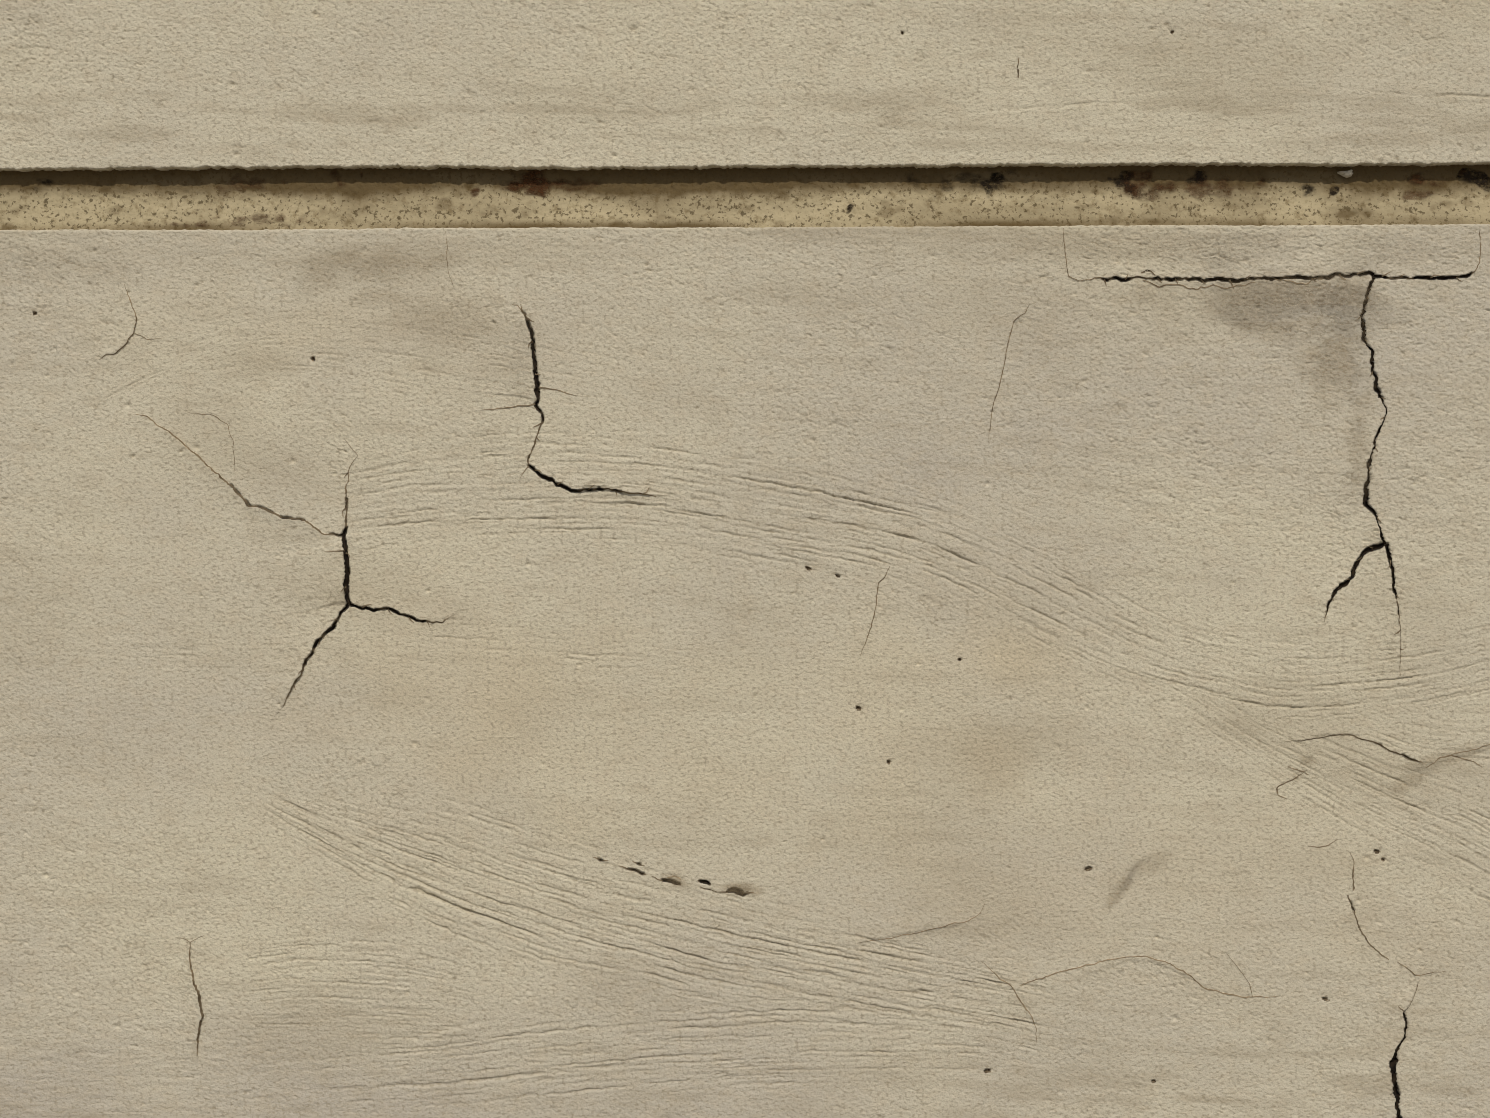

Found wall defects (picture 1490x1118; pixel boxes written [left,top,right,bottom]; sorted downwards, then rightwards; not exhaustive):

crack [136,412,448,706]
crack [483,304,656,497]
crack [1063,228,1481,674]
crack [1310,840,1444,1118]